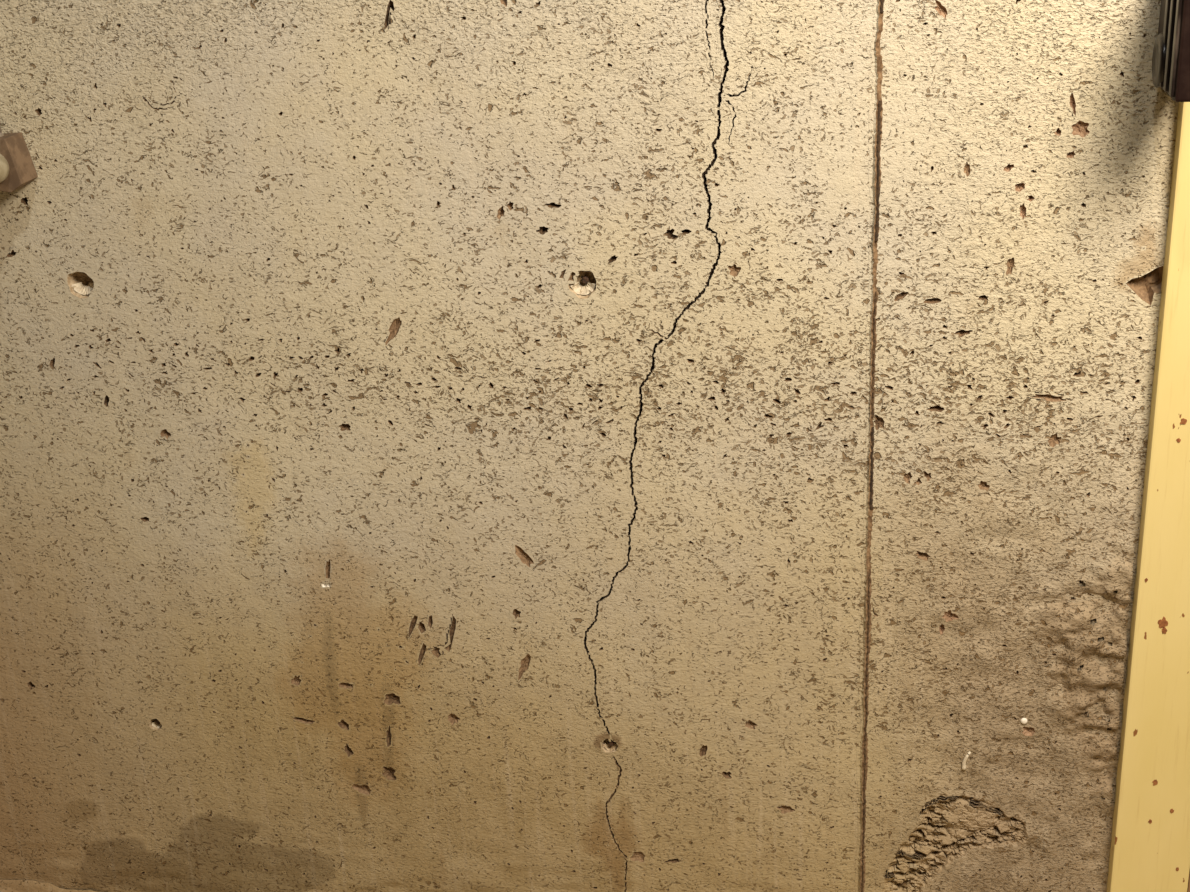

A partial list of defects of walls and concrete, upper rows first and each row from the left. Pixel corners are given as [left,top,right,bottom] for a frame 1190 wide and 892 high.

crack [582,0,755,892]
damp [56,793,346,892]
spalling [876,789,1034,892]